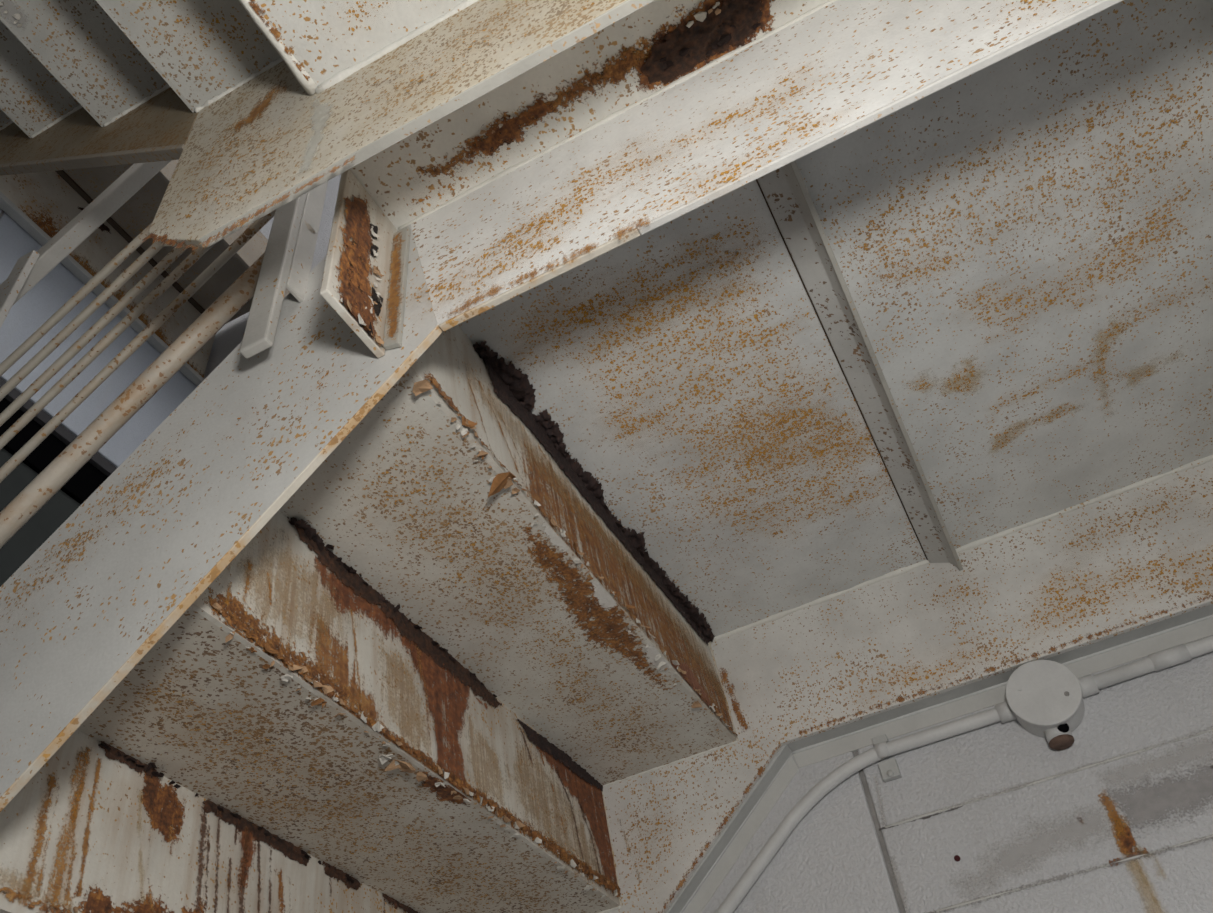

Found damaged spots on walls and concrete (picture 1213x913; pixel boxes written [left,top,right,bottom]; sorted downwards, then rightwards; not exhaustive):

rust [407,0,775,206]
rust [387,58,850,337]
rust [840,68,1212,343]
rust [208,517,502,807]
rust [363,408,667,758]
rust [469,214,894,730]
rust [909,364,976,392]
rust [799,477,1213,735]
rust [990,278,1213,416]
rust [20,673,554,913]
rust [517,719,780,913]
rust [1098,793,1148,867]